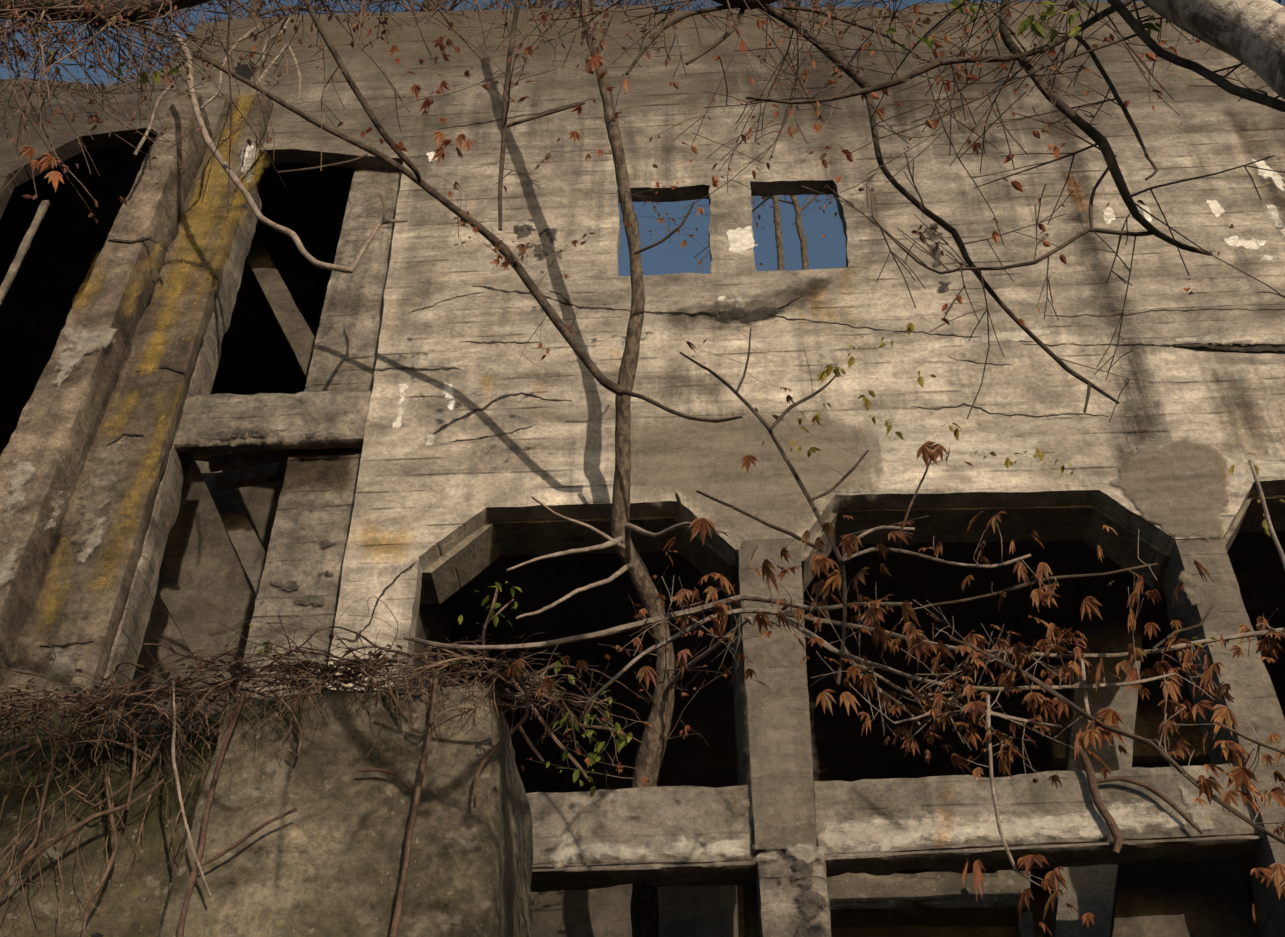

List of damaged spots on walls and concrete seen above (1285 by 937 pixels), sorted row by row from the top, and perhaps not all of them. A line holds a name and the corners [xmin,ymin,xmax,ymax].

water stain [1253,159,1285,191]
water stain [141,96,261,372]
water stain [1102,207,1116,224]
water stain [1206,200,1225,217]
water stain [1224,204,1285,260]
crack [408,285,715,317]
crack [771,291,1285,366]
crack [433,392,572,443]